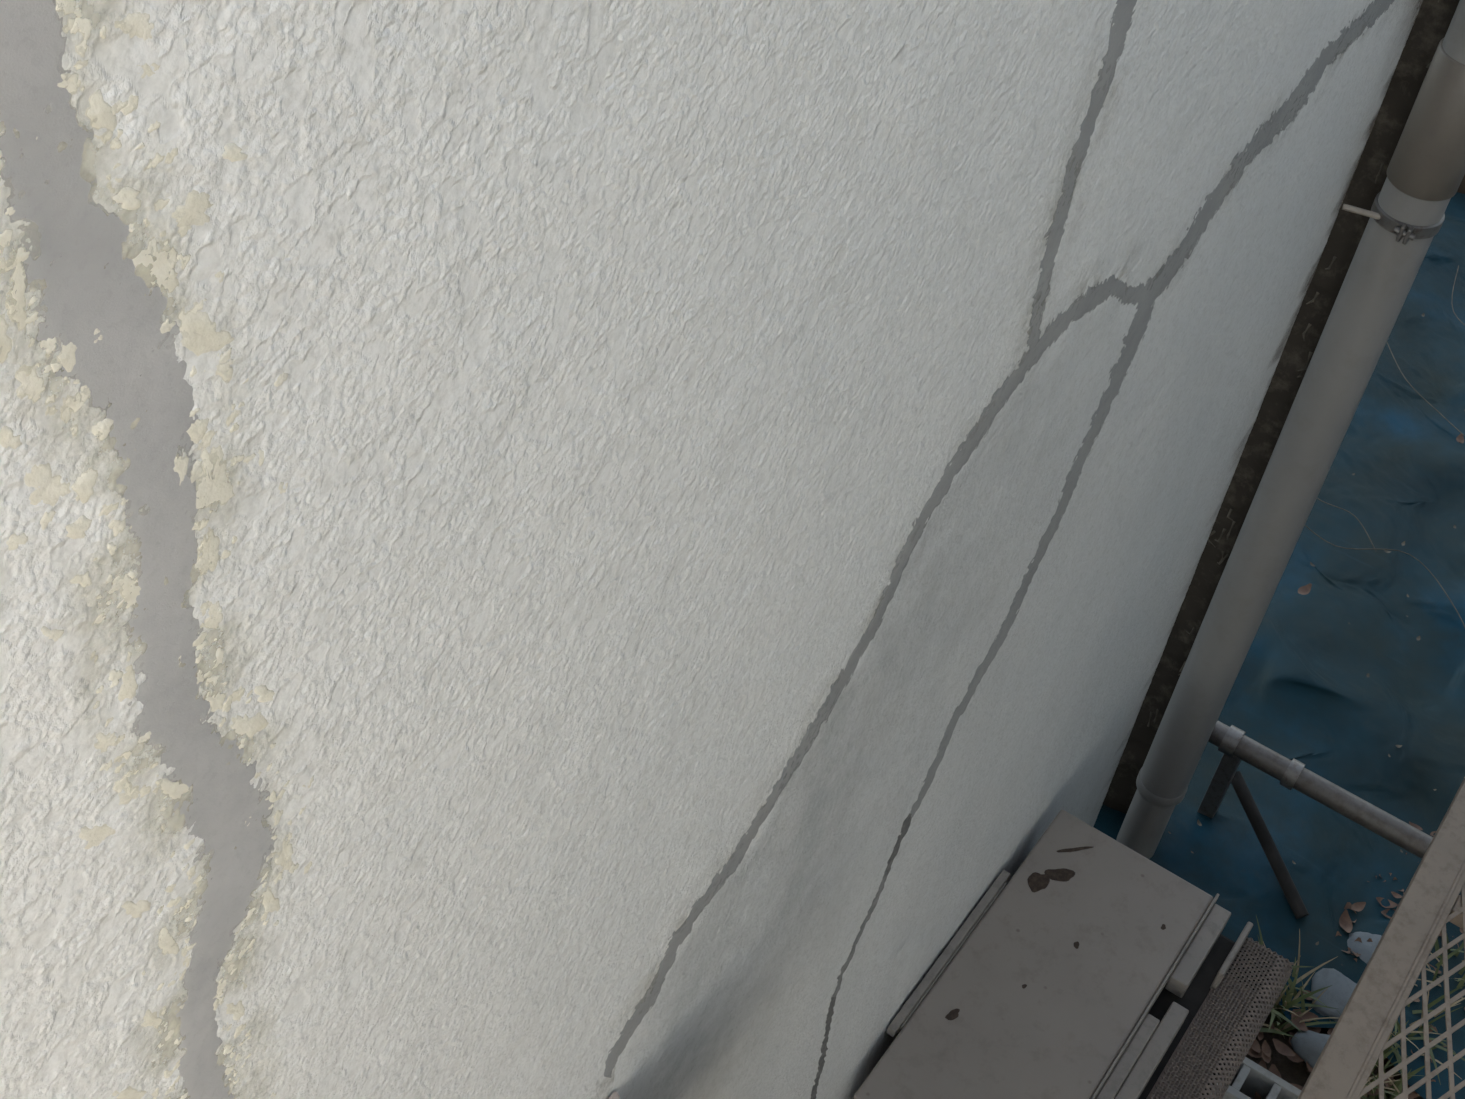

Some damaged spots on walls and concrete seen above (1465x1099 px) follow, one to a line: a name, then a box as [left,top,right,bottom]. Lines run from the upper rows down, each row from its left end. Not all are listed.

crack [0,0,314,1099]
crack [604,0,1395,1099]